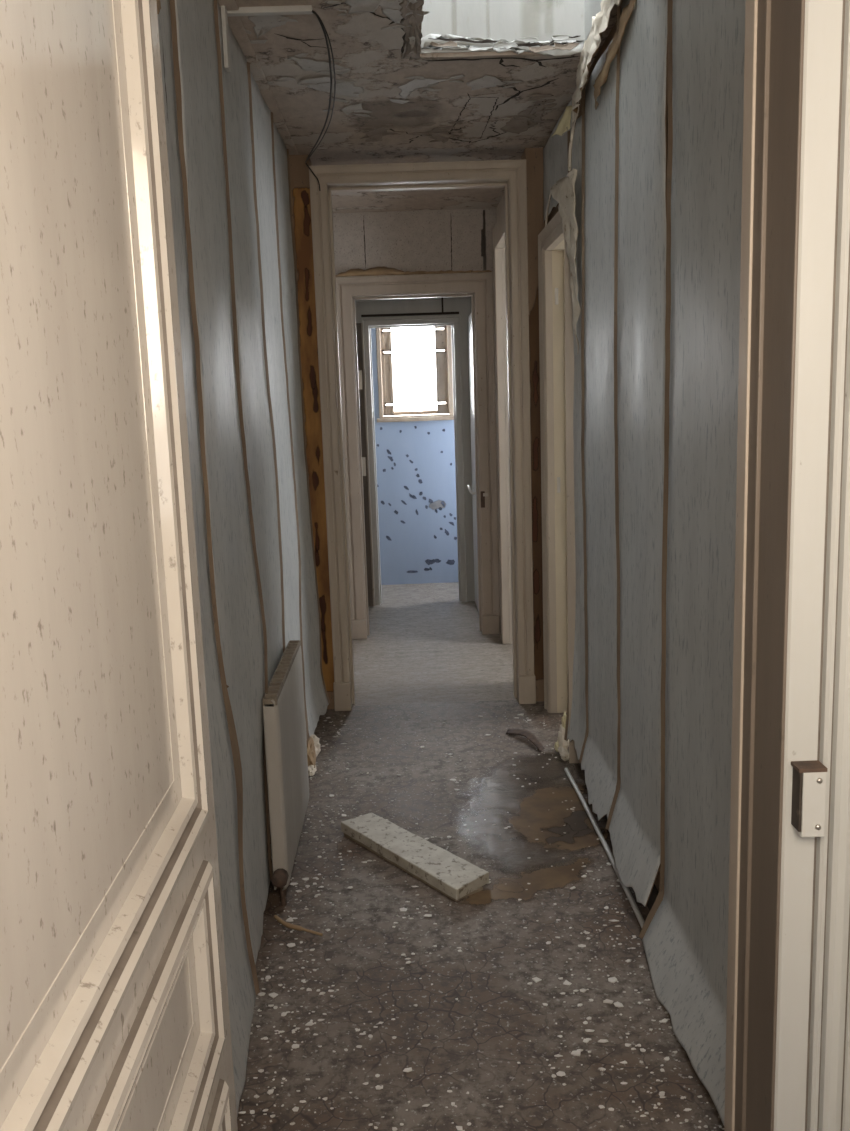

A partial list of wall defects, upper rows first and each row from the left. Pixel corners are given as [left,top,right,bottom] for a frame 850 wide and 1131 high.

crack [274,33,326,48]
spalling [380,0,585,60]
crack [323,3,580,145]